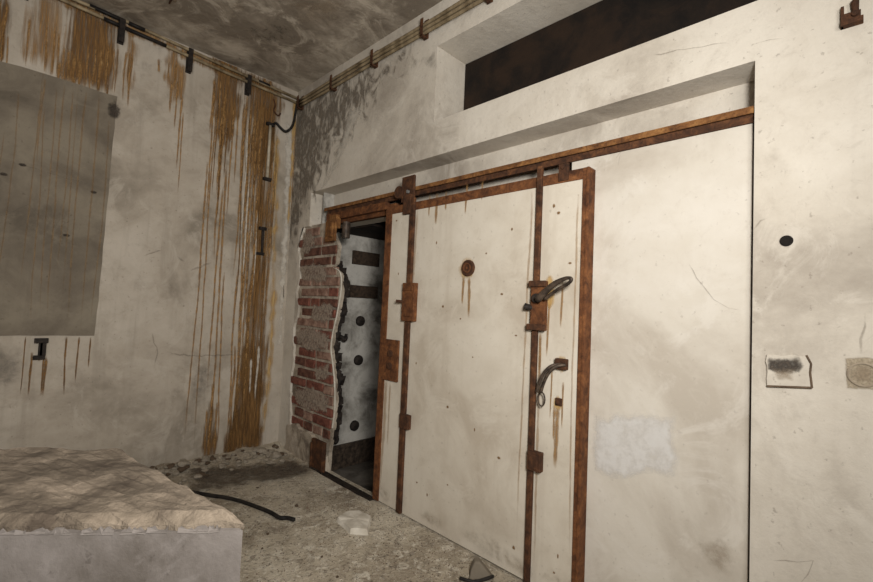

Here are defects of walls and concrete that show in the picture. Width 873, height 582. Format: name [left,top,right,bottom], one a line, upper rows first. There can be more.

corrosion [0,0,9,63]
corrosion [21,0,296,455]
leakage [280,66,395,320]
spalling [285,223,351,472]
corrosion [462,273,472,312]
corrosion [539,277,563,371]
corrosion [550,374,564,461]